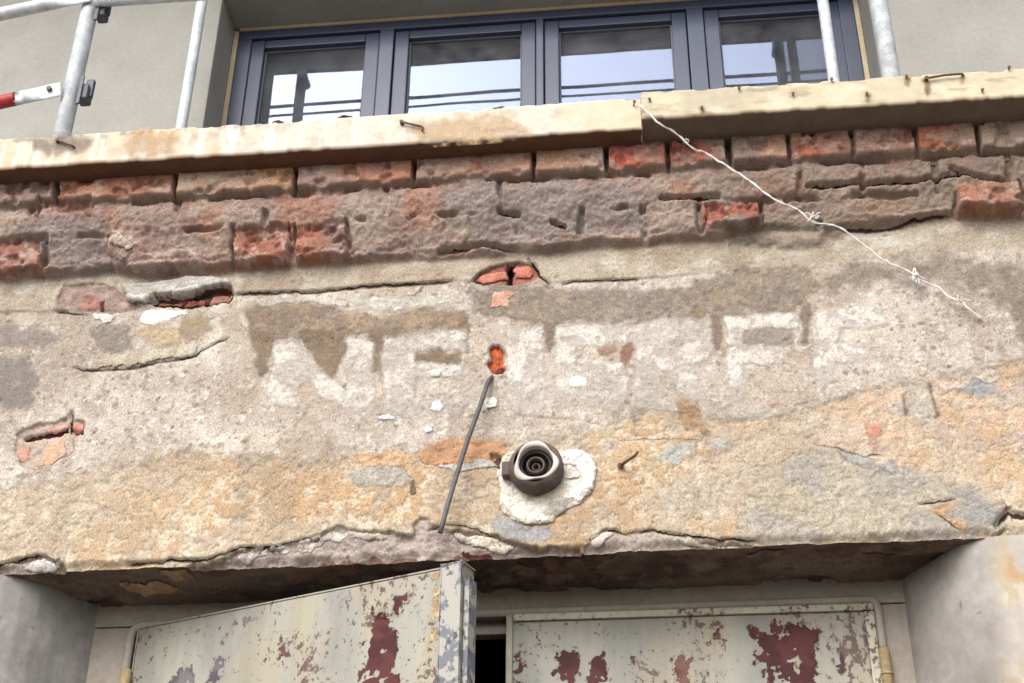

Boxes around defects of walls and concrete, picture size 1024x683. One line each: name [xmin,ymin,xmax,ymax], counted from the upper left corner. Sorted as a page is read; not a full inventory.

spalling [56,276,234,323]
crack [239,281,452,296]
spalling [474,262,538,307]
crack [78,338,229,376]
spalling [488,345,506,374]
spalling [15,414,84,470]
crack [0,555,57,567]
crack [131,535,317,566]
crack [429,524,493,537]
crack [604,529,755,543]
crack [920,498,962,530]
crack [996,502,1024,536]